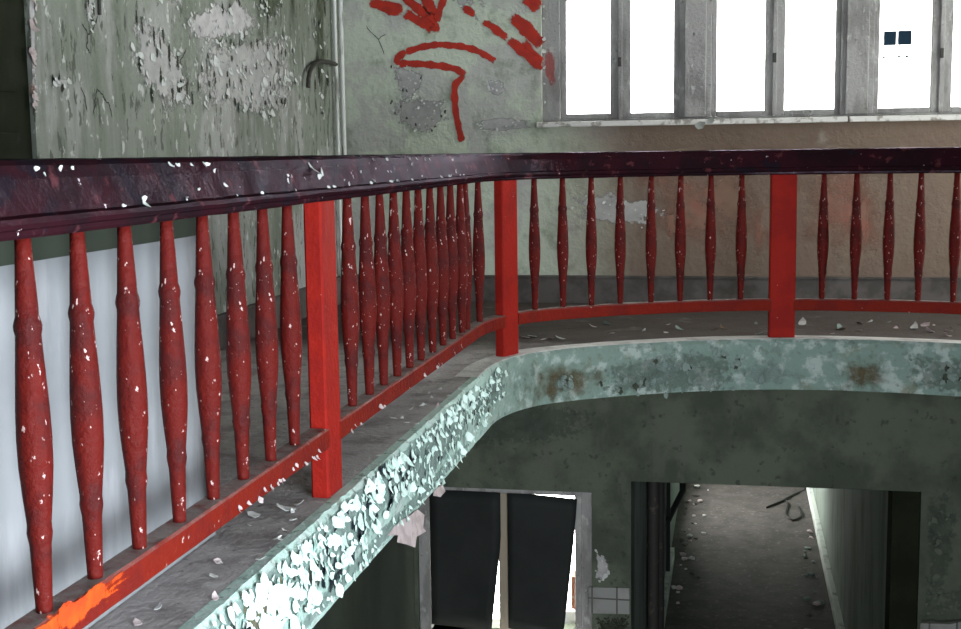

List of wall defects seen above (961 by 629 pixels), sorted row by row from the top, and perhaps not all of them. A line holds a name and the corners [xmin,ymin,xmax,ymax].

peeling [130,0,298,119]
peeling [210,367,508,629]
peeling [36,572,126,629]